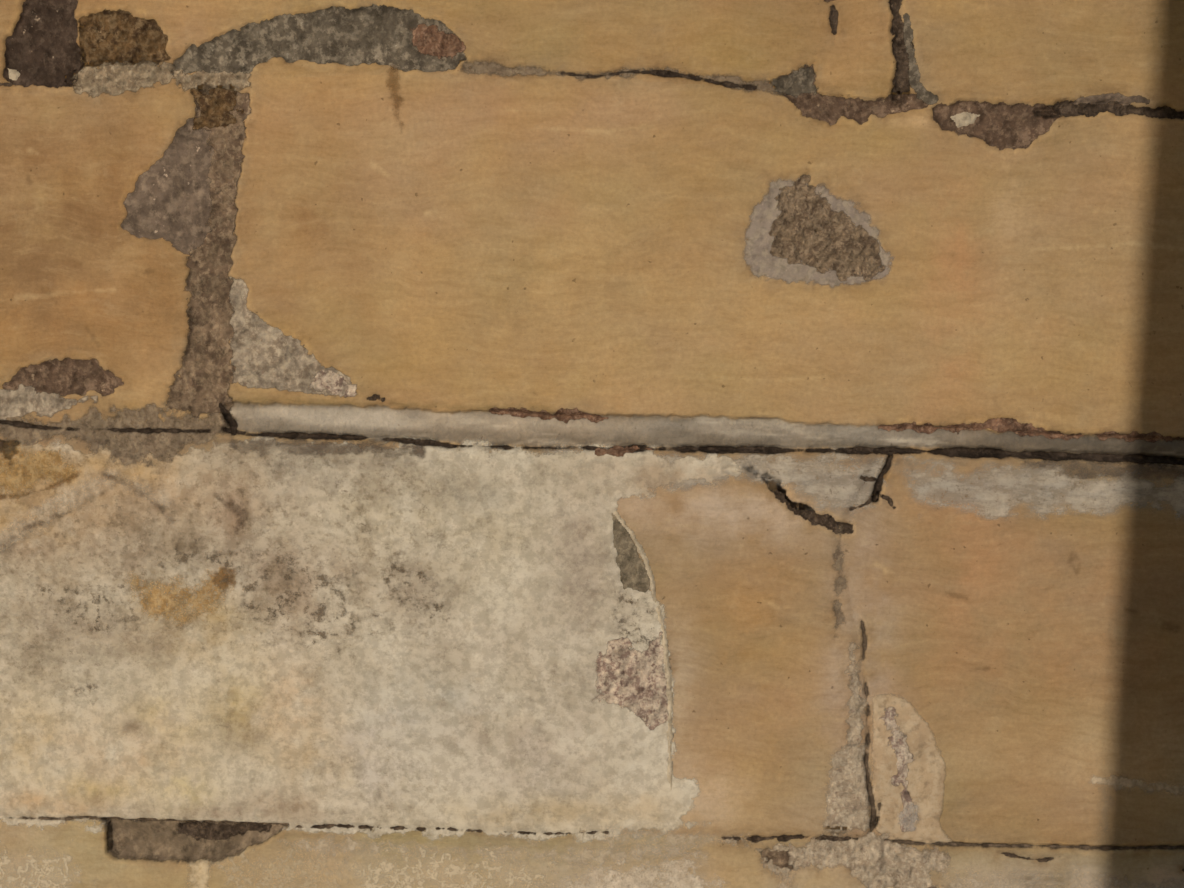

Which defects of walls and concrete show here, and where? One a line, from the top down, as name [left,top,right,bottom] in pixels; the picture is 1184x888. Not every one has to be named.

spalling [71,4,466,98]
crack [461,61,781,95]
crack [824,0,838,35]
crack [1032,92,1184,120]
spalling [744,175,894,288]
spalling [229,277,385,402]
spalling [0,358,124,420]
spalling [489,407,608,423]
spalling [878,418,1184,443]
damp [0,436,885,888]
peeling [596,511,674,790]
crack [722,452,1184,871]